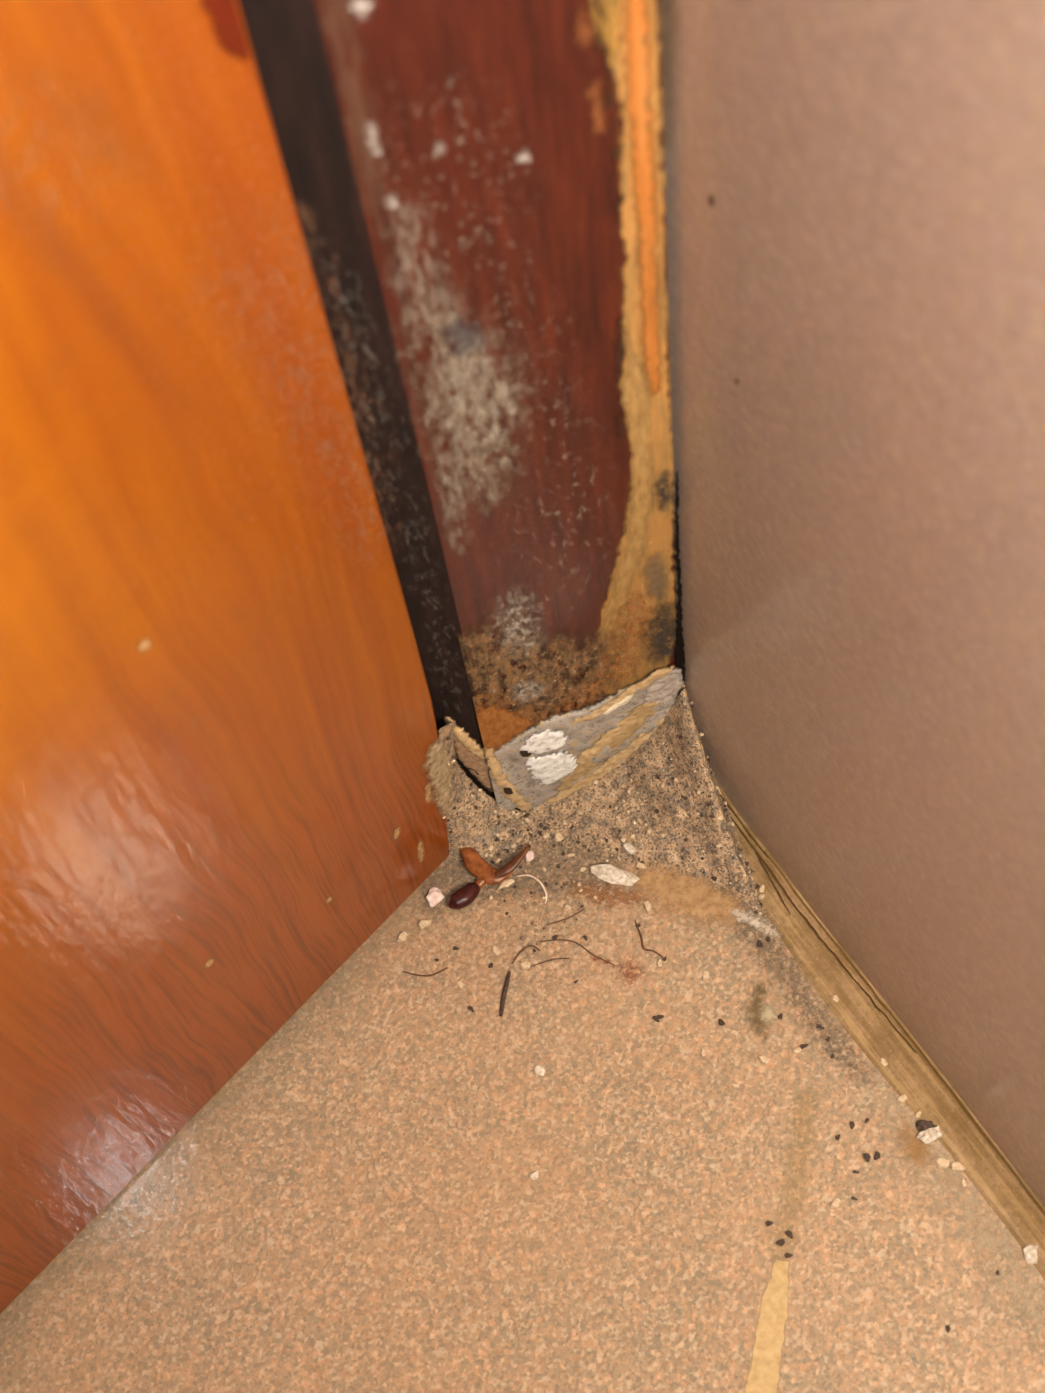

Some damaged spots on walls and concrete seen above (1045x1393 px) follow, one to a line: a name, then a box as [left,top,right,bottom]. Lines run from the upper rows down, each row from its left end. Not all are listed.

peeling [328,0,396,209]
water stain [427,305,518,497]
peeling [578,0,676,695]
spalling [438,680,775,945]